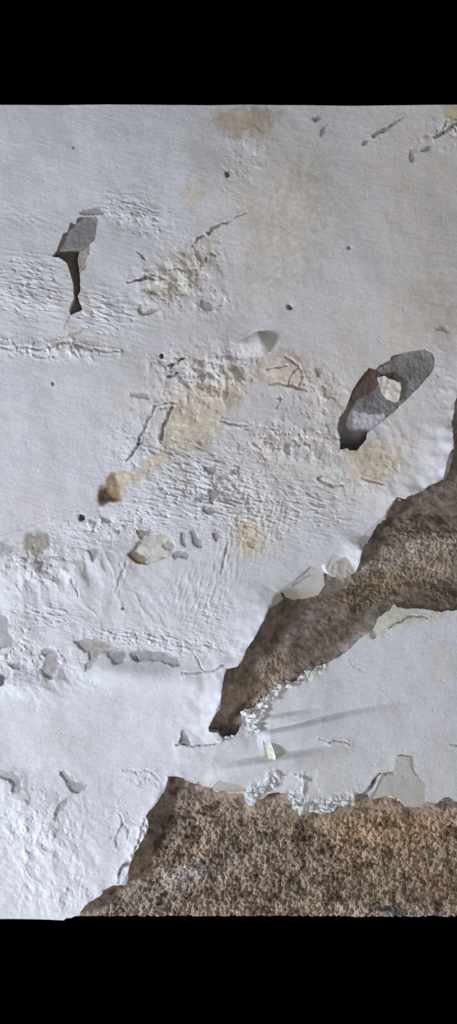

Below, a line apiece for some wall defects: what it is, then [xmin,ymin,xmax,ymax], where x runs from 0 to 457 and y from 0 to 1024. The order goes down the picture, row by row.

flaking render [55,207,103,315]
damp [131,350,307,482]
flaking render [337,350,435,451]
spalling [73,398,457,917]